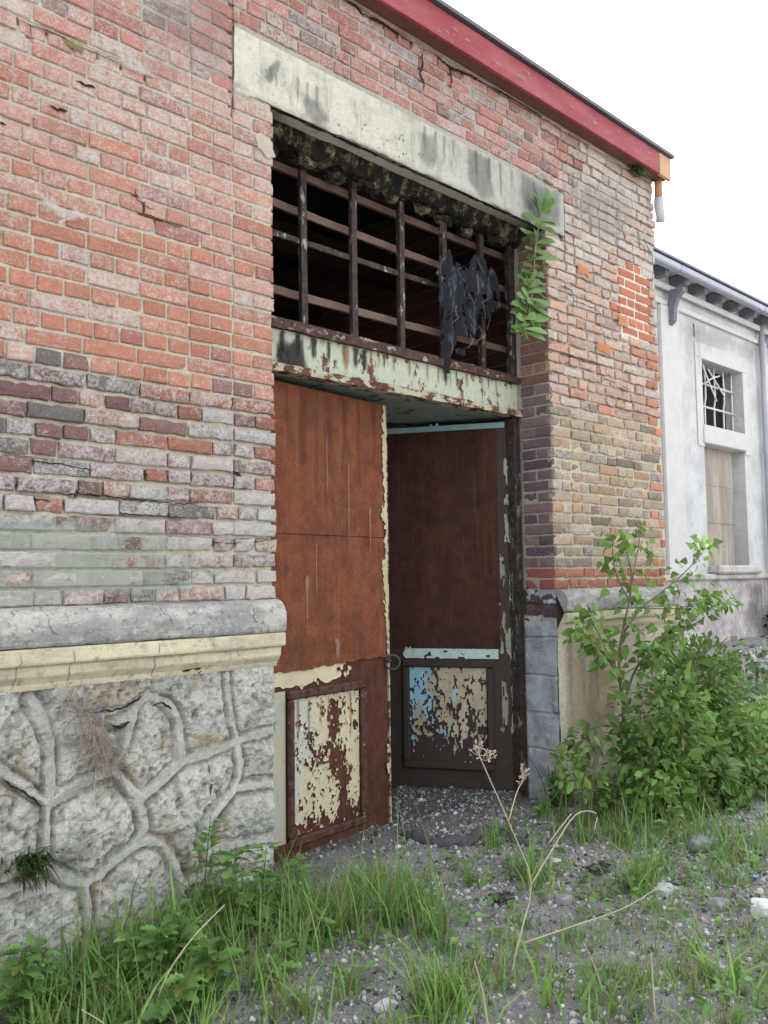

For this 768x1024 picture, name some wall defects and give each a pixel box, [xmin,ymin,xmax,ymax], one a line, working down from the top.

crack [346,0,540,115]
crack [2,460,194,518]
peeling [381,405,504,675]
crack [84,645,172,729]
peeling [273,663,360,847]
peeling [403,554,514,763]